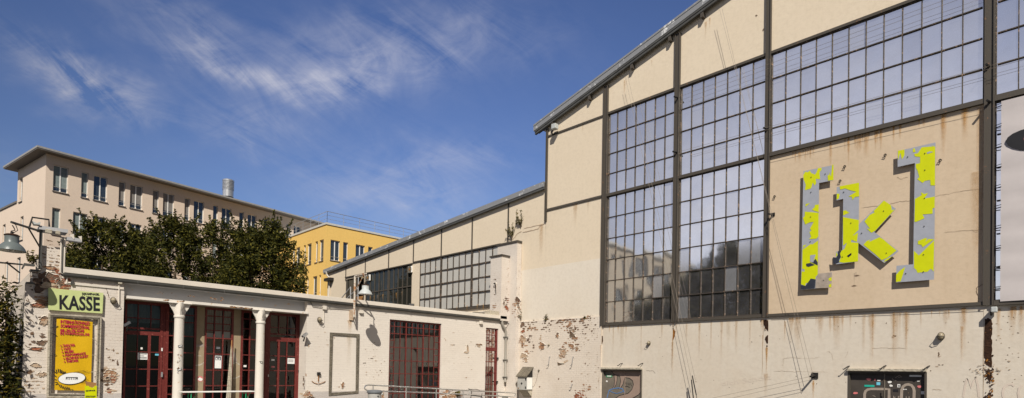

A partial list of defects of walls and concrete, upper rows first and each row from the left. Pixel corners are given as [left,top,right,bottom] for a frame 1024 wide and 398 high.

flaking render [24,240,72,392]
spalling [492,268,599,398]
corrosion [983,318,995,398]